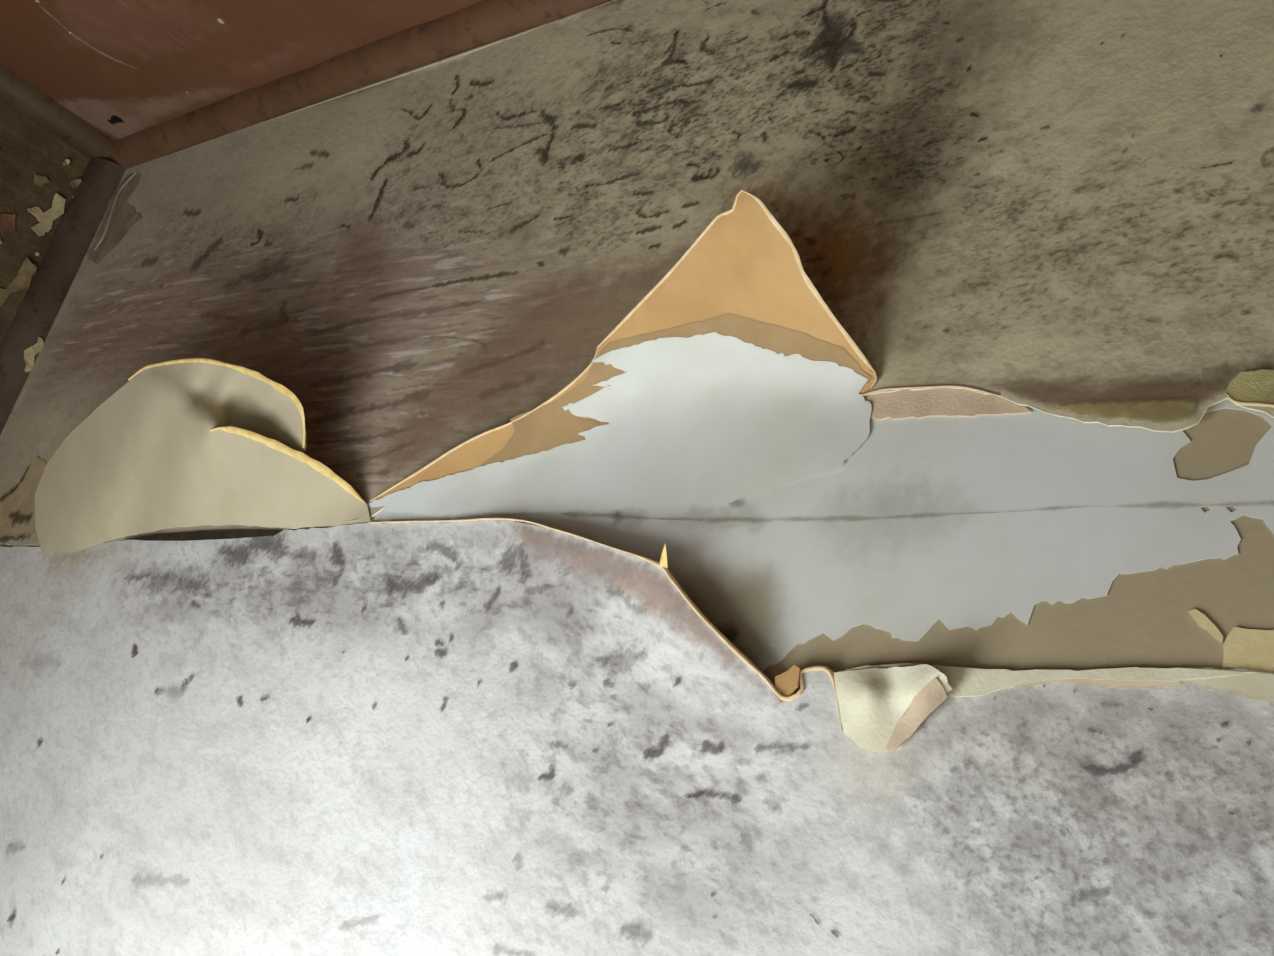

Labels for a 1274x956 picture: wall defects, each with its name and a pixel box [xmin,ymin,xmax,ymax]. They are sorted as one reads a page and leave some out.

water stain [598,0,987,190]
water stain [368,140,424,220]
water stain [438,111,596,189]
water stain [635,202,699,249]
water stain [371,268,661,461]
water stain [218,536,285,577]
water stain [286,545,344,628]
water stain [377,561,437,635]
water stain [719,626,737,640]
water stain [643,735,668,759]
water stain [701,741,723,755]
water stain [687,791,740,803]